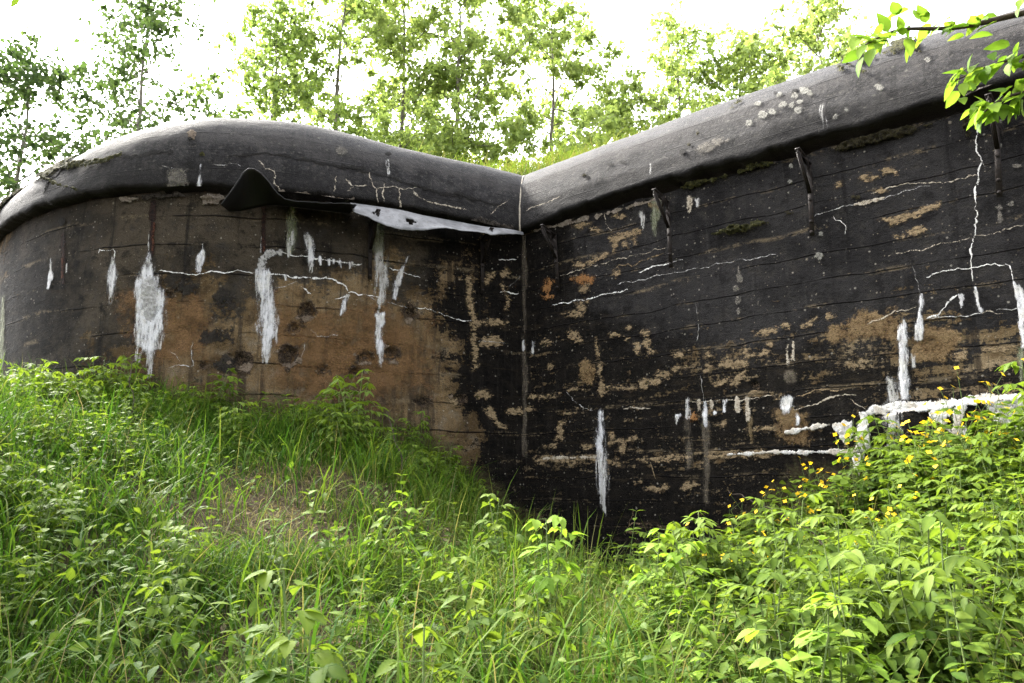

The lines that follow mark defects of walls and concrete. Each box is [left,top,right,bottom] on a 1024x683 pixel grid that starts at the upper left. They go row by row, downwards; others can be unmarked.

leakage [134,244,205,374]
efflorescence [255,207,315,363]
crack [160,252,471,336]
crack [227,152,558,214]
peeling [466,267,513,371]
spalling [531,196,666,317]
peeling [445,312,834,429]
crack [555,248,775,305]
leakage [675,294,1024,475]
peeling [882,201,940,239]
crack [828,131,1023,324]
efflorescence [543,411,607,513]